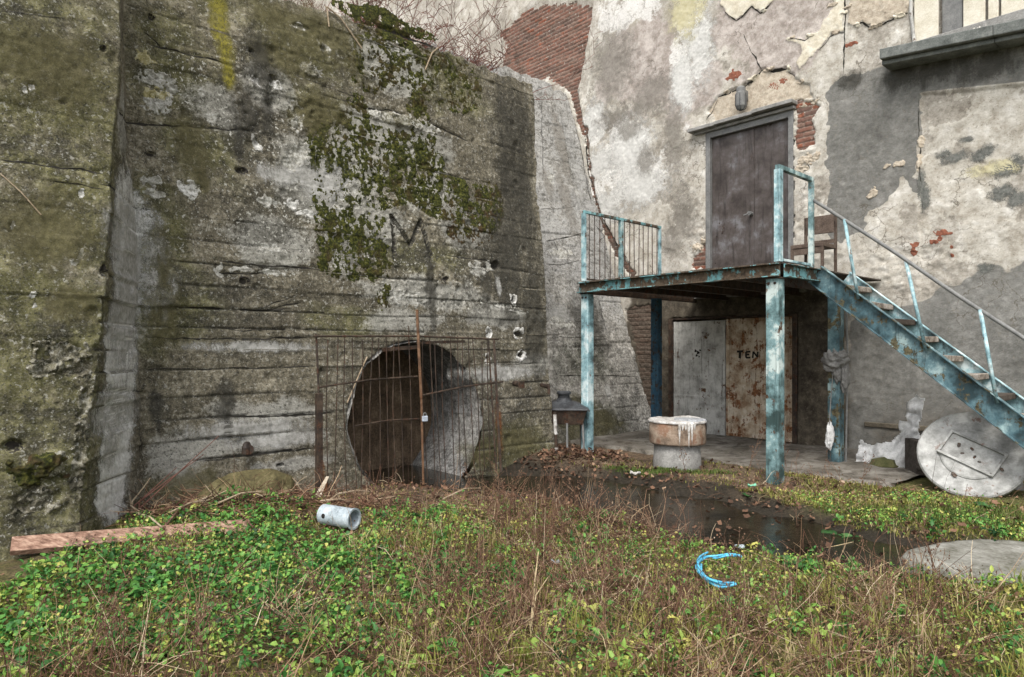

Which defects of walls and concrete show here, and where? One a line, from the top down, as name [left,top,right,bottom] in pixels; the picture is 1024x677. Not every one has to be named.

flaking render [720,0,773,19]
crack [707,3,795,118]
flaking render [767,0,909,90]
crack [790,0,907,72]
damp [223,39,336,159]
crack [447,124,627,272]
flaking render [500,1,636,276]
flaking render [794,99,821,173]
damp [936,136,1024,209]
flaking render [910,229,954,257]
spalling [487,298,526,315]